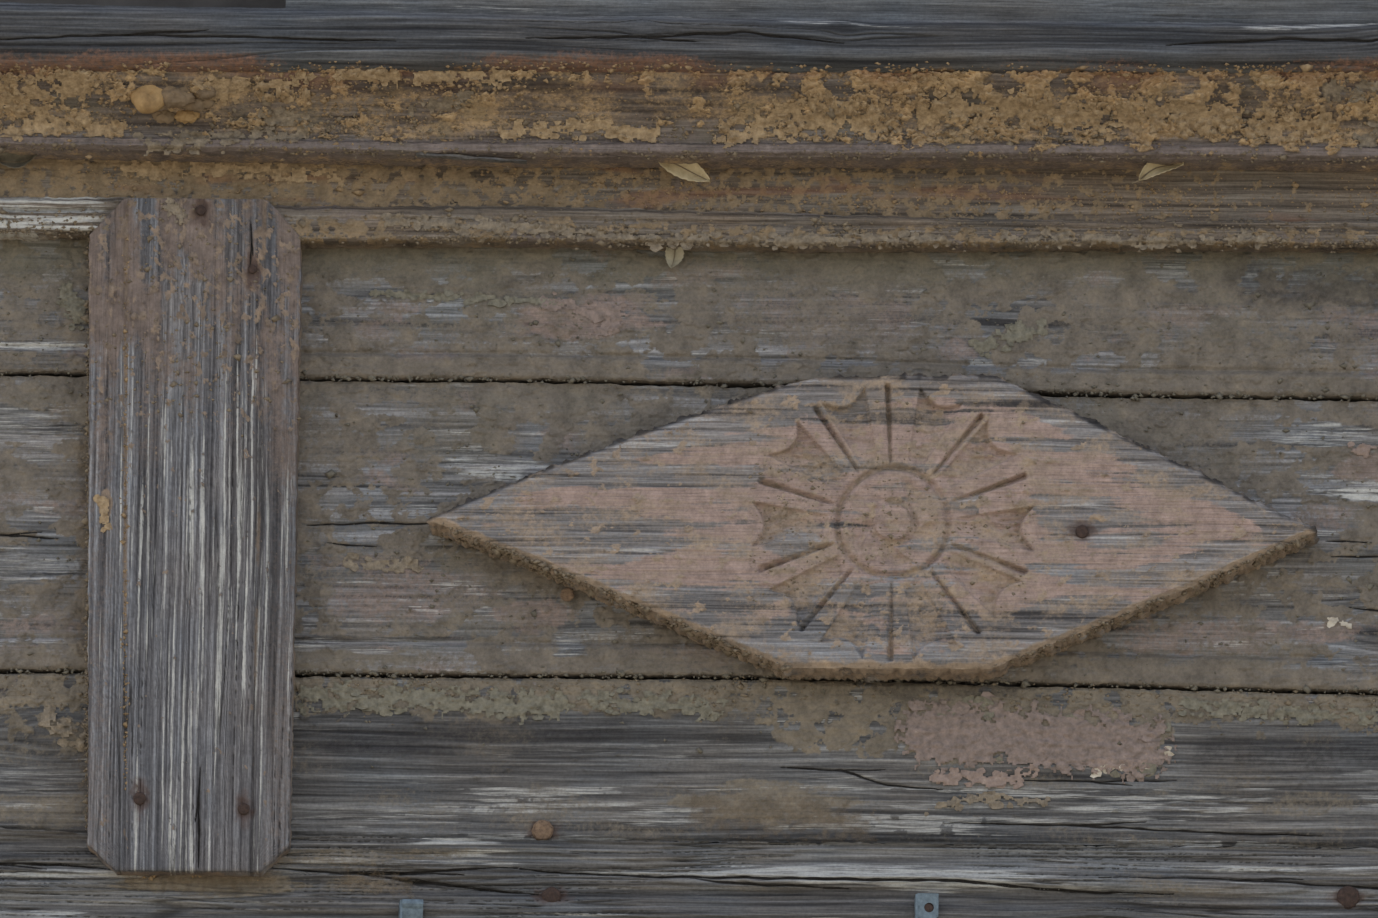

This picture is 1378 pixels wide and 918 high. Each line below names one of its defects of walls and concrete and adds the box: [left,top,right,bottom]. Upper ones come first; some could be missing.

peeling [0,66,511,188]
peeling [497,114,660,143]
peeling [713,80,1339,148]
peeling [894,692,1378,817]